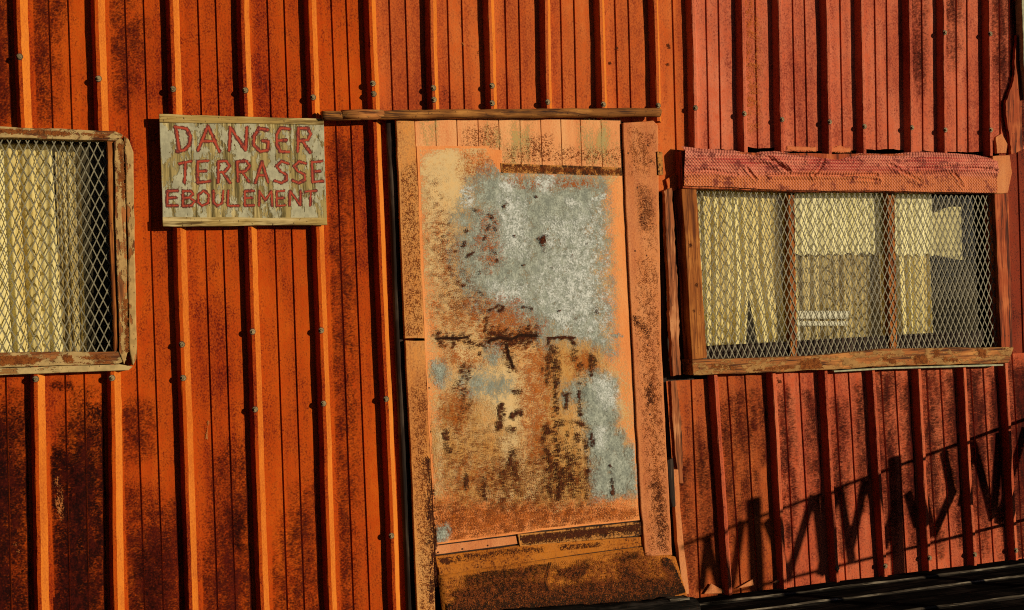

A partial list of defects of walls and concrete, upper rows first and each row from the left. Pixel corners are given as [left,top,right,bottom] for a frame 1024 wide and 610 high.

peeling [117,143,126,200]
peeling [420,122,638,502]
peeling [0,354,42,366]
peeling [61,354,114,364]
rust [401,126,1024,610]